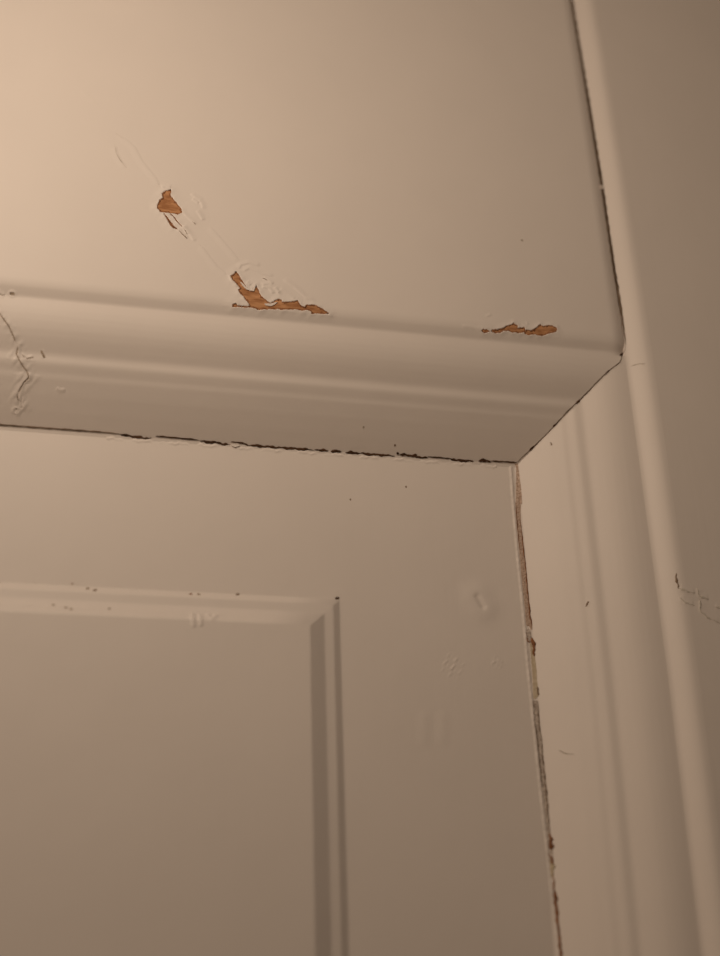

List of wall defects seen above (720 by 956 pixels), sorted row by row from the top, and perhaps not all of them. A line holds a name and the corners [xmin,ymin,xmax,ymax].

peeling [148,181,210,242]
peeling [221,258,338,323]
peeling [462,312,564,343]
crack [0,288,153,444]
crack [157,0,626,956]